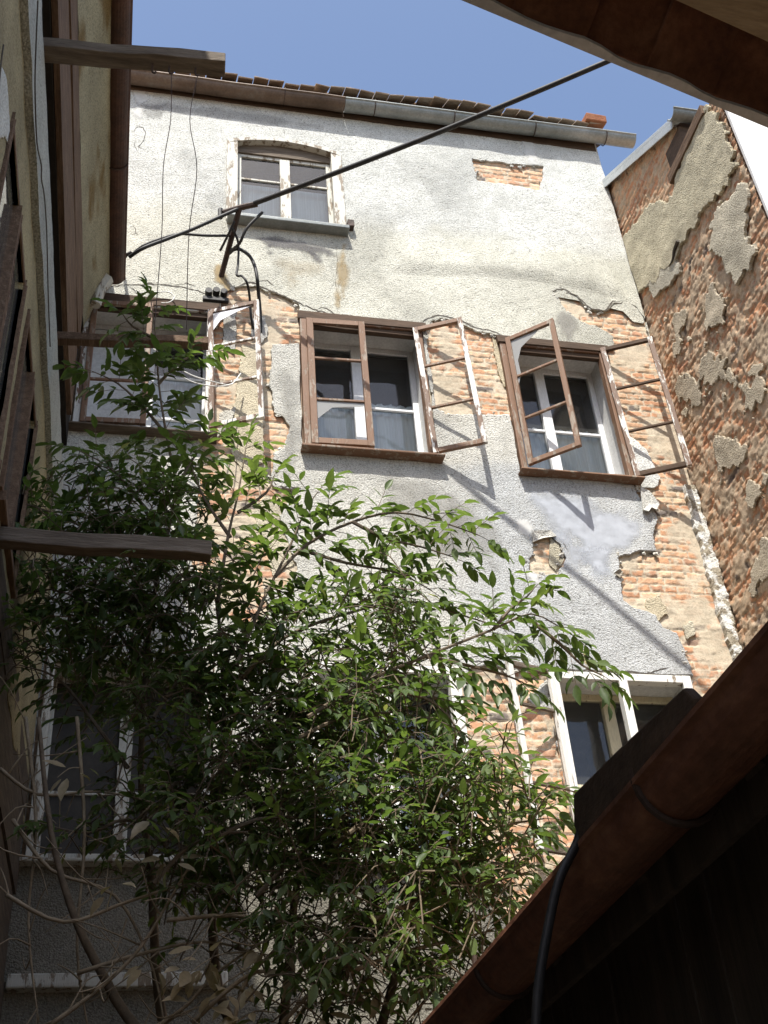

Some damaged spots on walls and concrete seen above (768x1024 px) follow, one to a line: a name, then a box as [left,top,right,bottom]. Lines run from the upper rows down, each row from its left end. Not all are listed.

spalling [472,158,543,190]
flaking render [623,104,759,298]
crack [552,287,619,313]
spalling [422,317,511,419]
spalling [192,284,301,622]
spalling [553,292,742,697]
spalling [525,530,566,578]